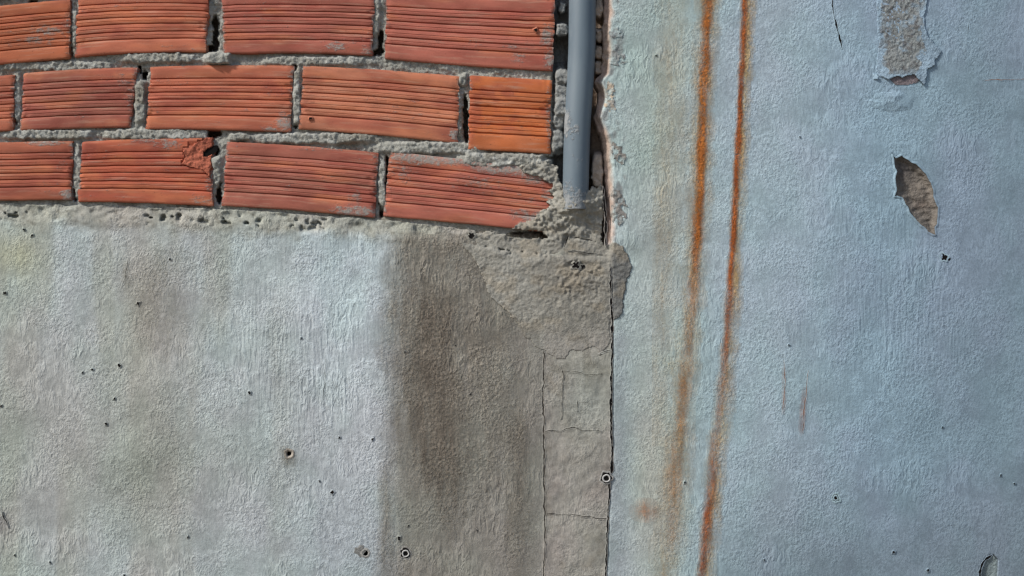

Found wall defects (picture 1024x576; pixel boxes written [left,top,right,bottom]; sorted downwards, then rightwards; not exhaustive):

crack [831,0,843,49]
peeling [873,0,942,85]
spalling [182,138,218,176]
rust [690,0,715,292]
rust [722,0,752,392]
spalling [891,153,940,237]
leakage [387,235,523,545]
crack [541,186,614,576]
rust [700,461,721,576]